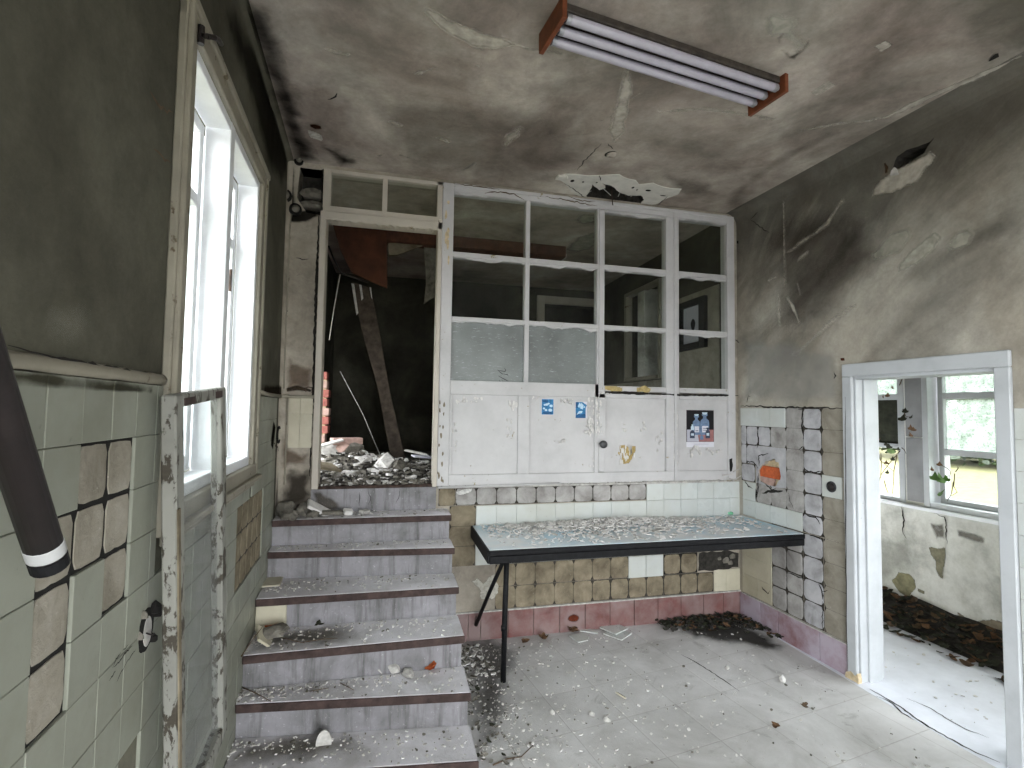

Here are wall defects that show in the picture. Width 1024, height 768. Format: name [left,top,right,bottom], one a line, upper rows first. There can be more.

damp [427,10,510,48]
damp [611,71,631,138]
spalling [890,138,934,176]
flaking render [555,174,681,205]
peeling [690,408,847,642]
peeling [929,547,945,578]
peeling [892,572,924,596]